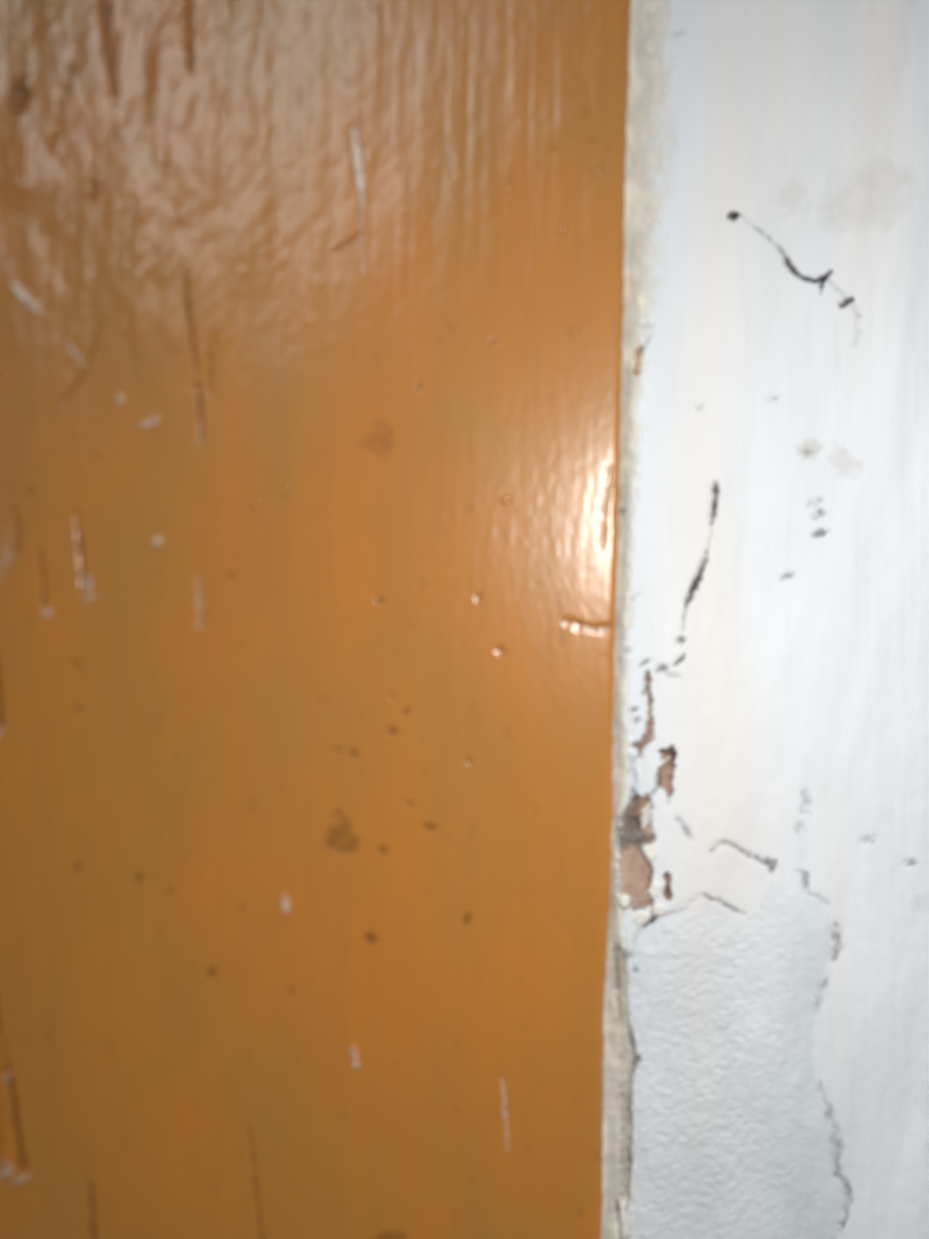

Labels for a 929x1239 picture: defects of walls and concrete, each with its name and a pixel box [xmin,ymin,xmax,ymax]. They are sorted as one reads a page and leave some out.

crack [728,212,740,220]
crack [781,250,854,308]
crack [642,484,719,670]
flaking render [617,673,677,926]
flaking render [615,945,641,1239]